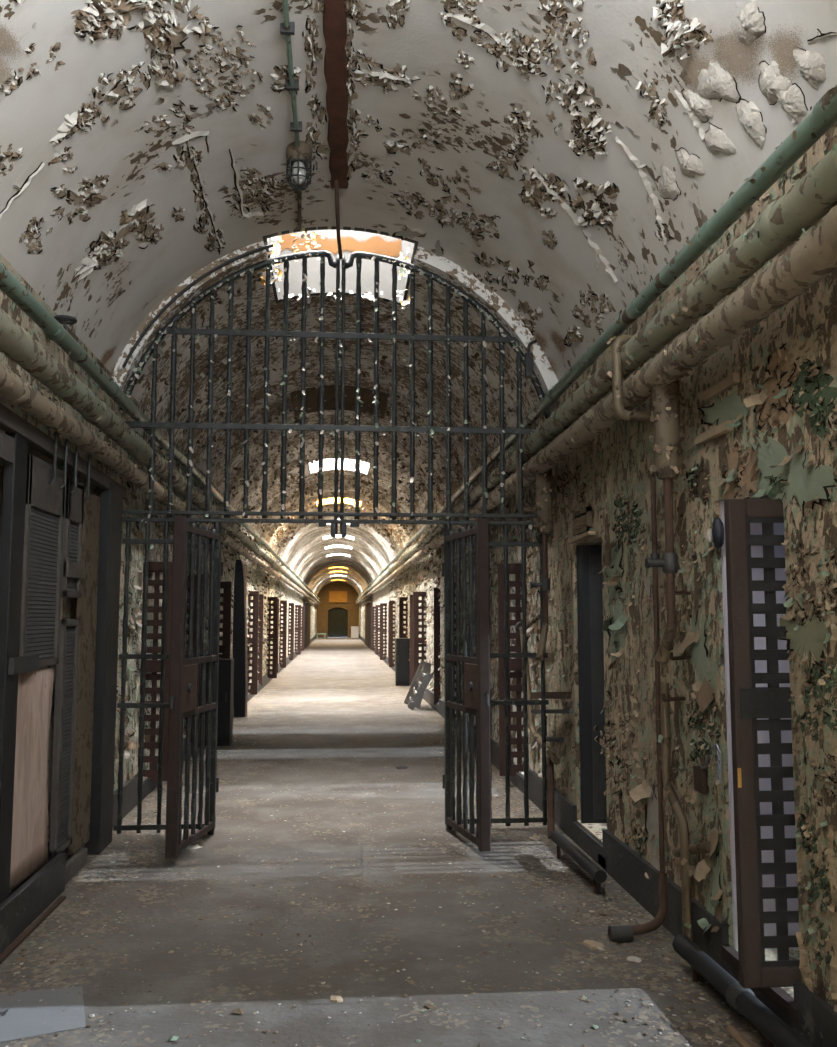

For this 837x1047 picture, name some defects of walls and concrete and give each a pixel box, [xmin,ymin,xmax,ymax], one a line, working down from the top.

peeling [652,0,714,63]
peeling [0,42,65,95]
peeling [345,0,620,250]
peeling [635,78,669,126]
peeling [0,143,24,176]
crack [0,162,45,219]